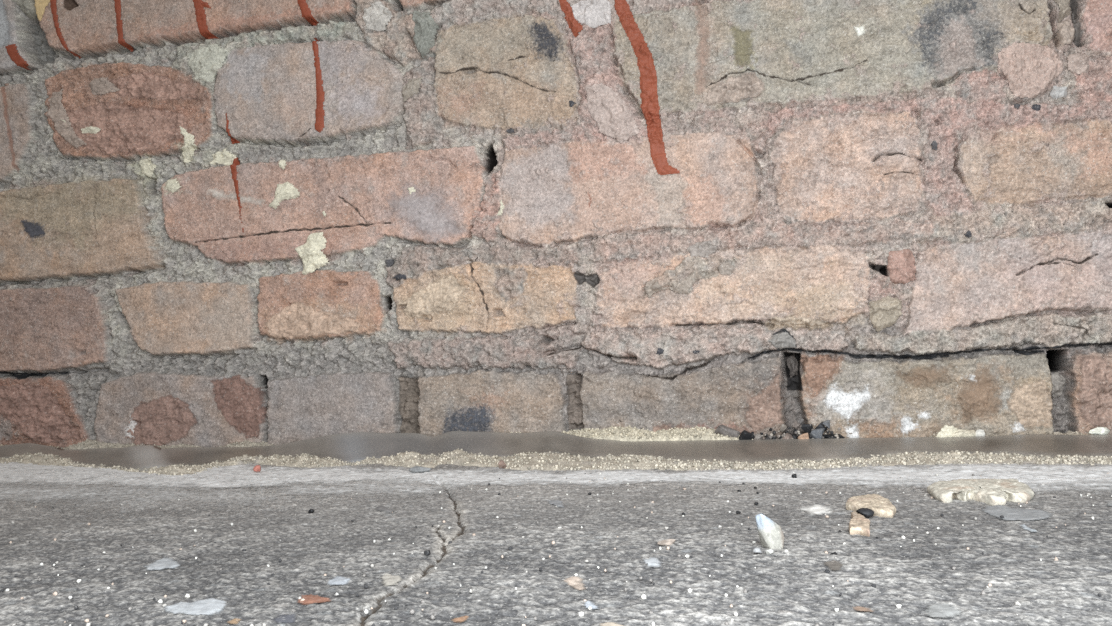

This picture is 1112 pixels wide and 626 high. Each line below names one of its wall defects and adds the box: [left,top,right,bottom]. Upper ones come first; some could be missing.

crack [873,153,921,175]
crack [1016,254,1098,276]
crack [676,319,766,327]
crack [360,487,465,626]